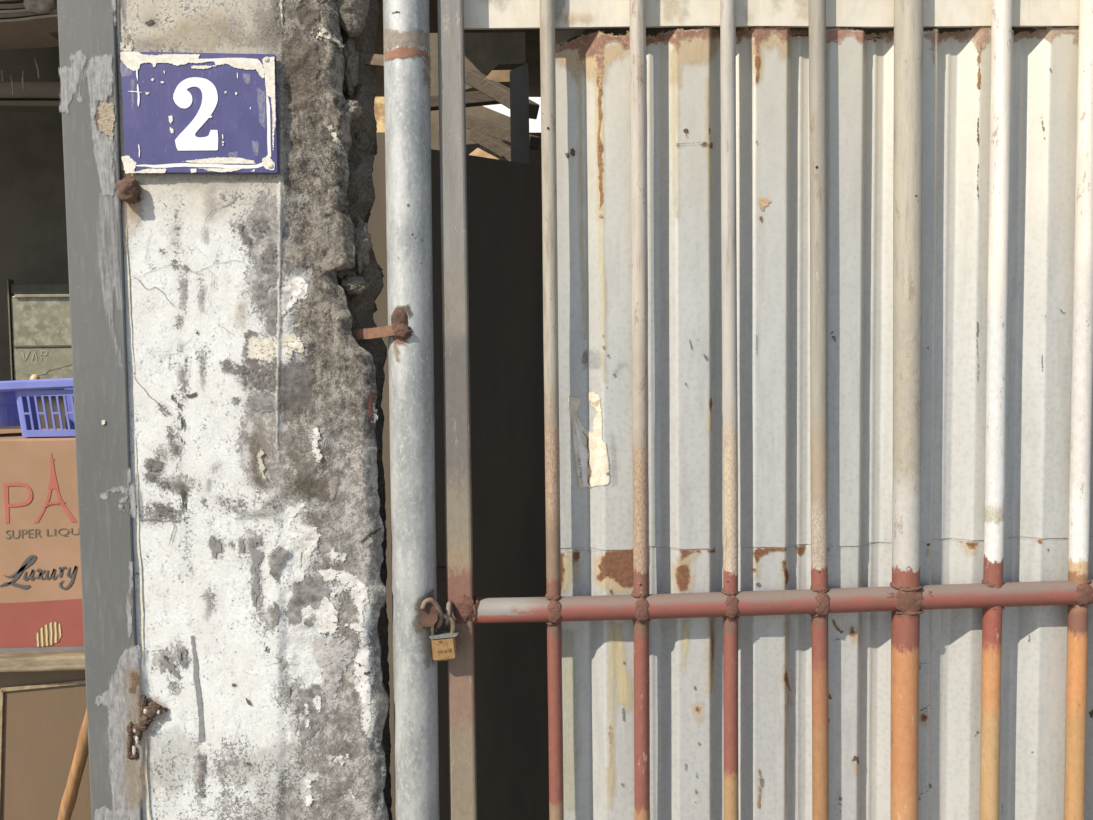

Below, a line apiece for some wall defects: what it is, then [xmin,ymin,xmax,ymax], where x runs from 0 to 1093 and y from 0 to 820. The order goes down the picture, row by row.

rust [736,26,808,83]
rust [924,26,991,88]
rust [555,30,630,219]
flaking render [367,394,378,423]
spalling [311,427,323,463]
spalling [345,451,368,492]
rust [596,549,633,594]
rust [675,548,715,591]
rust [752,545,805,586]
peeling [207,501,380,752]
peeling [158,635,208,797]
peeling [300,775,318,806]